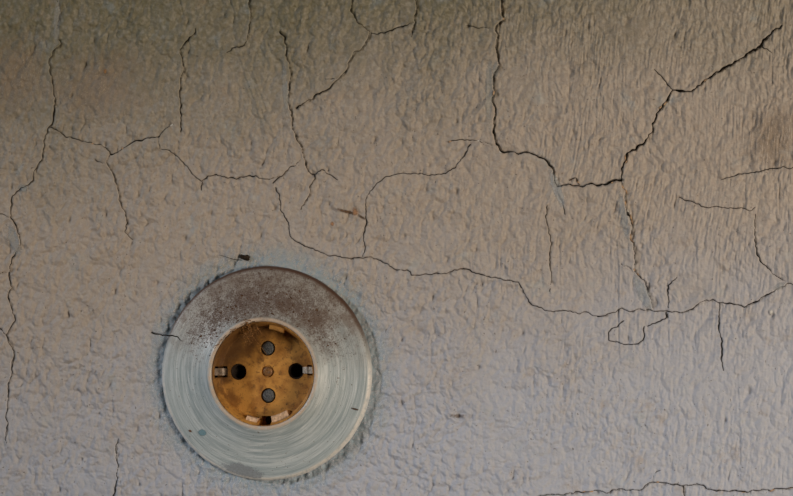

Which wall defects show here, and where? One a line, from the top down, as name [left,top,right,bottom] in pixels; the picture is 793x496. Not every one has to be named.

crack [0,1,635,443]
crack [365,0,793,371]
crack [540,470,793,496]